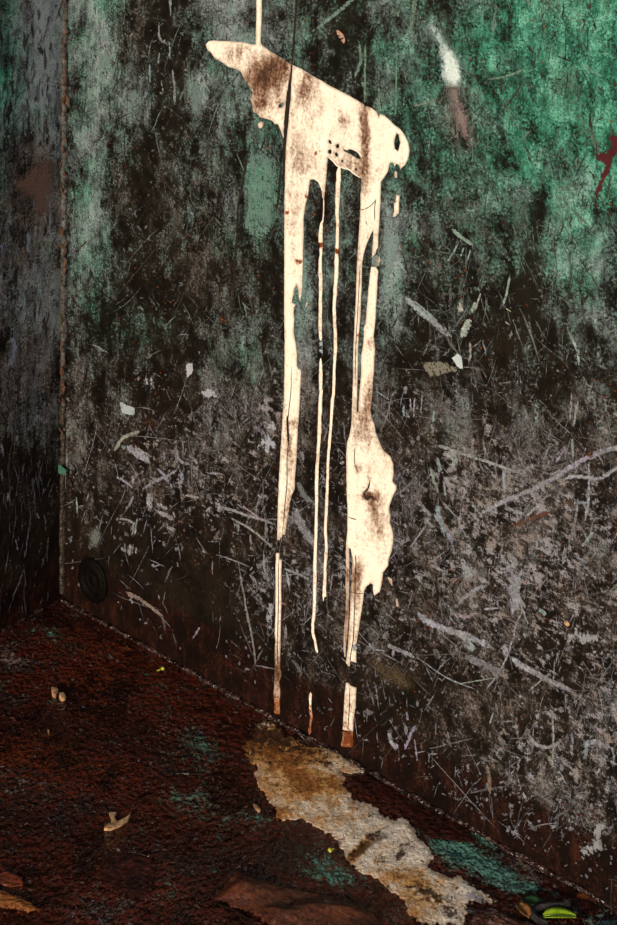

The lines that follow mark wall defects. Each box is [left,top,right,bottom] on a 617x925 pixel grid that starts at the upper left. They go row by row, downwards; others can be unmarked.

corrosion [345,773,476,844]
damp [354,835,387,859]
corrosion [0,871,39,913]
corrosion [212,871,380,925]
corrosion [469,908,534,925]
corrosion [533,872,600,916]